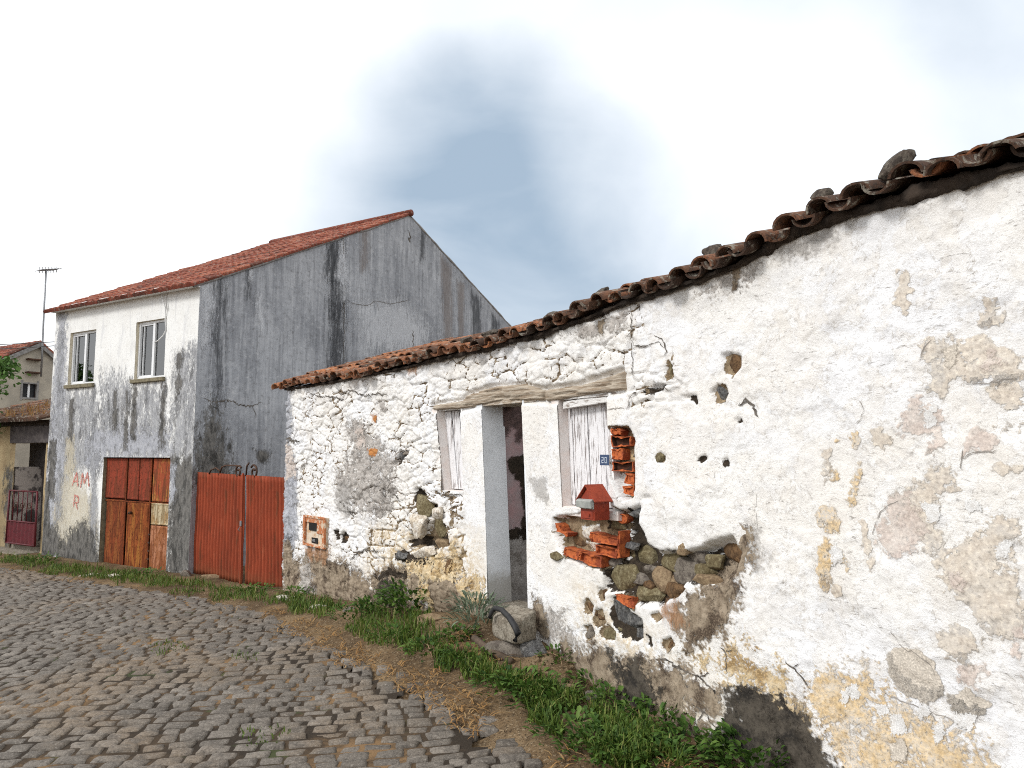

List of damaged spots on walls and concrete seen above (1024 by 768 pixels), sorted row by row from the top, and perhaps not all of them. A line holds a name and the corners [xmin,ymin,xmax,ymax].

water stain [246,269,265,336]
water stain [325,239,433,368]
water stain [472,295,499,334]
peeling [891,269,915,316]
water stain [41,279,236,573]
water stain [252,448,271,463]
water stain [350,413,378,457]
water stain [282,442,487,617]
spalling [394,489,454,574]
spalling [550,425,742,652]
peeling [797,296,1024,768]
water stain [531,570,844,768]